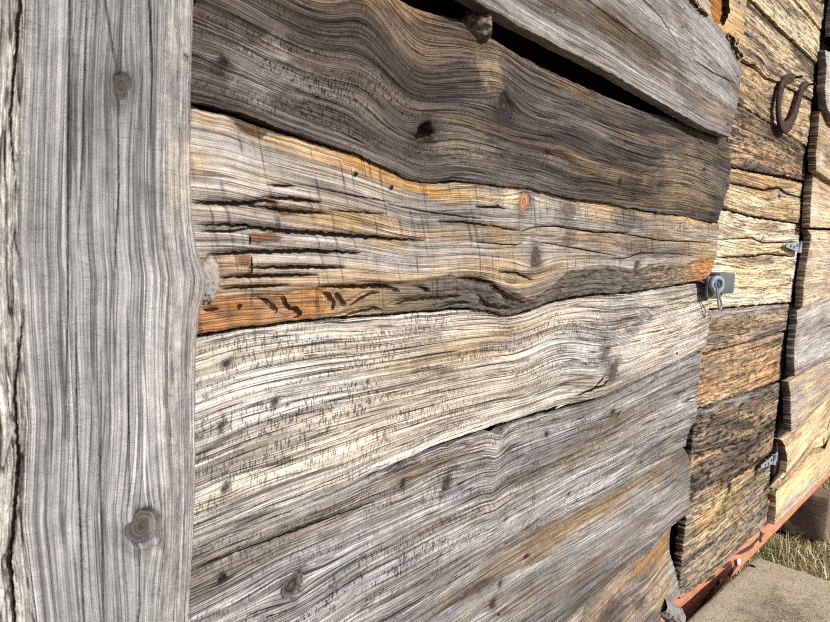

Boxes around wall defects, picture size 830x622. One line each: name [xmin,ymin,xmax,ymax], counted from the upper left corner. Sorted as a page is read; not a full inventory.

crack [195,183,803,289]
crack [578,377,610,395]